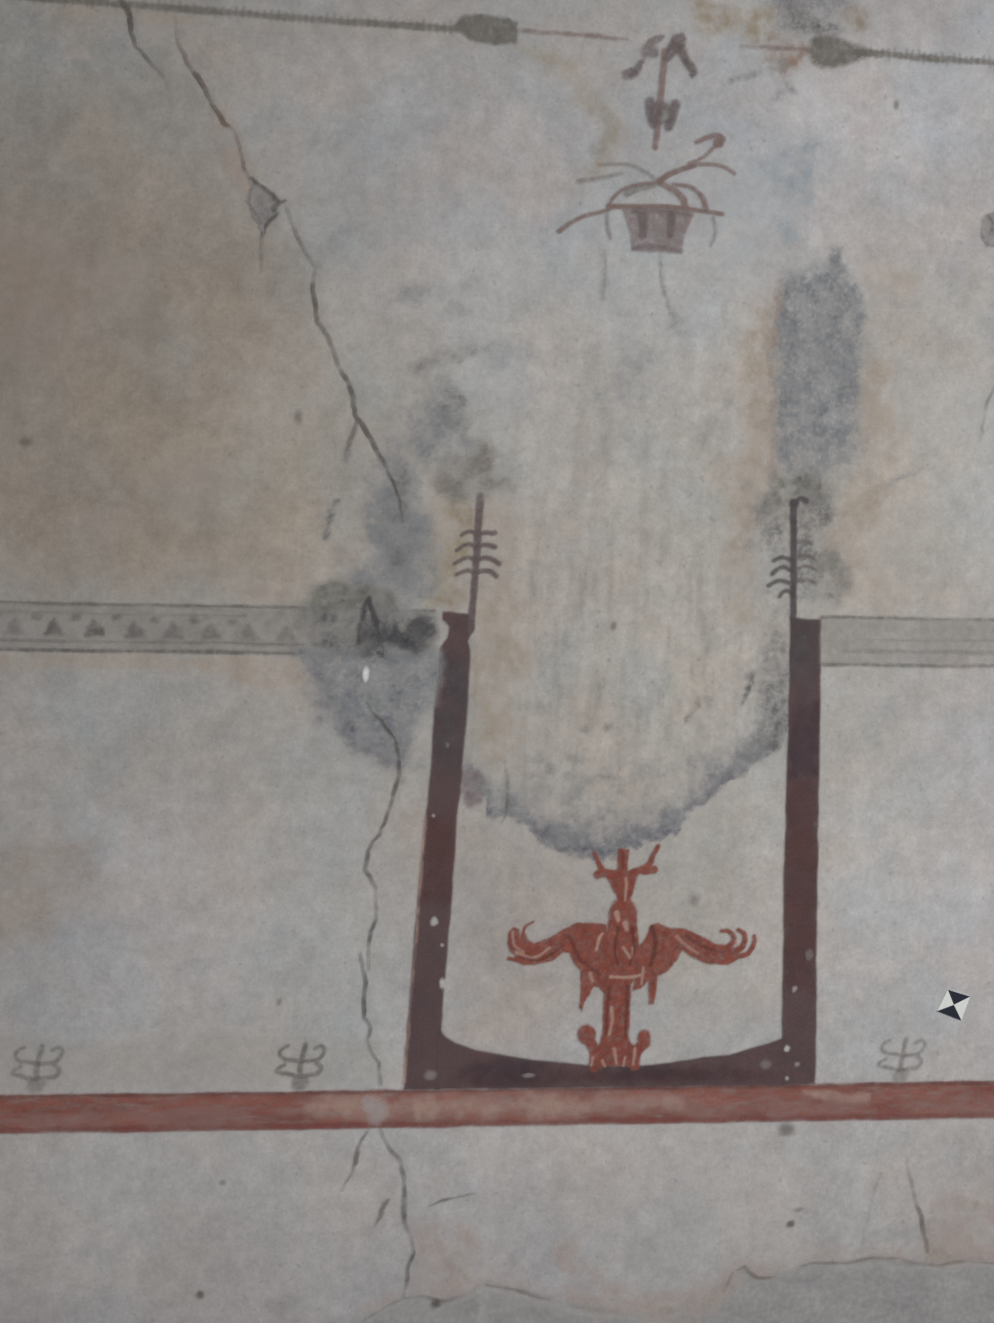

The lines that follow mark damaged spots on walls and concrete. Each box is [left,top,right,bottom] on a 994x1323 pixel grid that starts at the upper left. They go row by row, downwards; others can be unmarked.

crack [121,0,152,63]
crack [181,47,230,127]
crack [312,283,401,508]
leakage [722,252,893,597]
leakage [284,455,526,768]
crack [365,715,401,880]
leakage [462,631,816,862]
crack [361,919,381,1067]
crack [355,1135,415,1282]